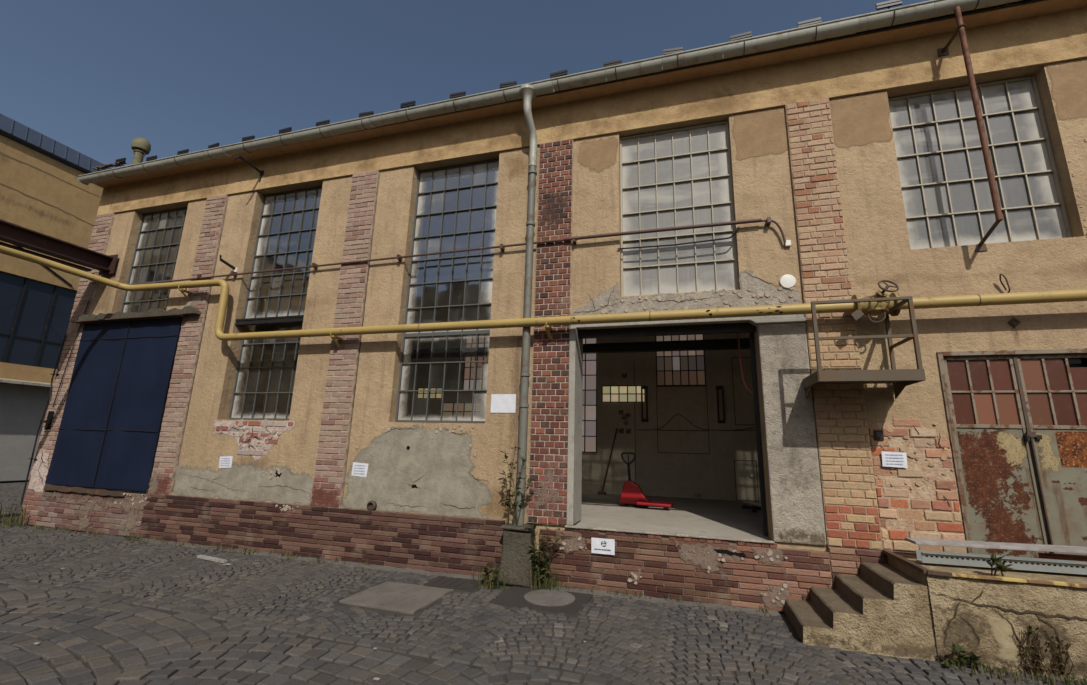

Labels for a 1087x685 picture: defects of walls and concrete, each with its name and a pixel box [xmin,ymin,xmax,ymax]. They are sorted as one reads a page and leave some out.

flaking render [571,270,802,323]
flaking render [212,419,295,477]
rust [1055,431,1087,473]
rust [957,428,1043,558]
rust [1051,479,1087,506]
spalling [674,540,792,609]
crack [933,590,1087,655]